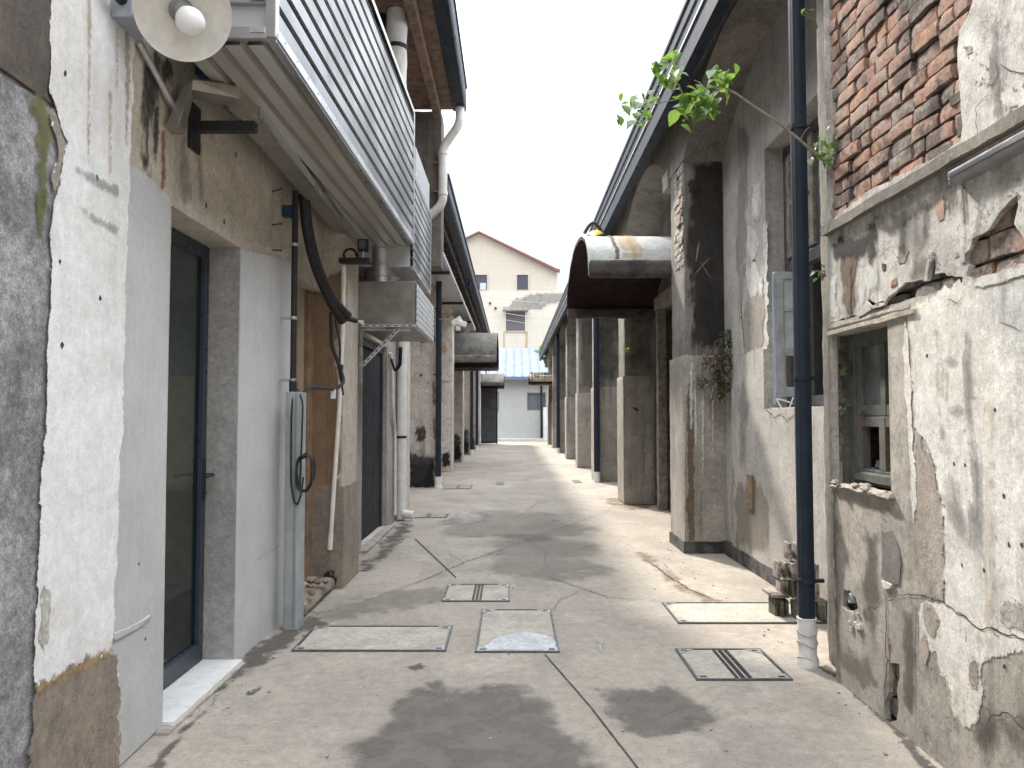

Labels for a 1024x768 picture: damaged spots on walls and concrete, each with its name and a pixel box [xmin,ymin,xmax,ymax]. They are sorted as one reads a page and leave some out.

peeling [50,108,66,192]
damp [142,53,173,169]
flaking render [828,0,998,221]
damp [37,197,45,237]
spalling [872,192,1024,310]
damp [686,363,714,541]
peeling [831,479,871,491]
peeling [27,649,122,768]
crack [866,590,1024,716]
peeling [967,659,980,690]
peeling [996,598,1024,631]